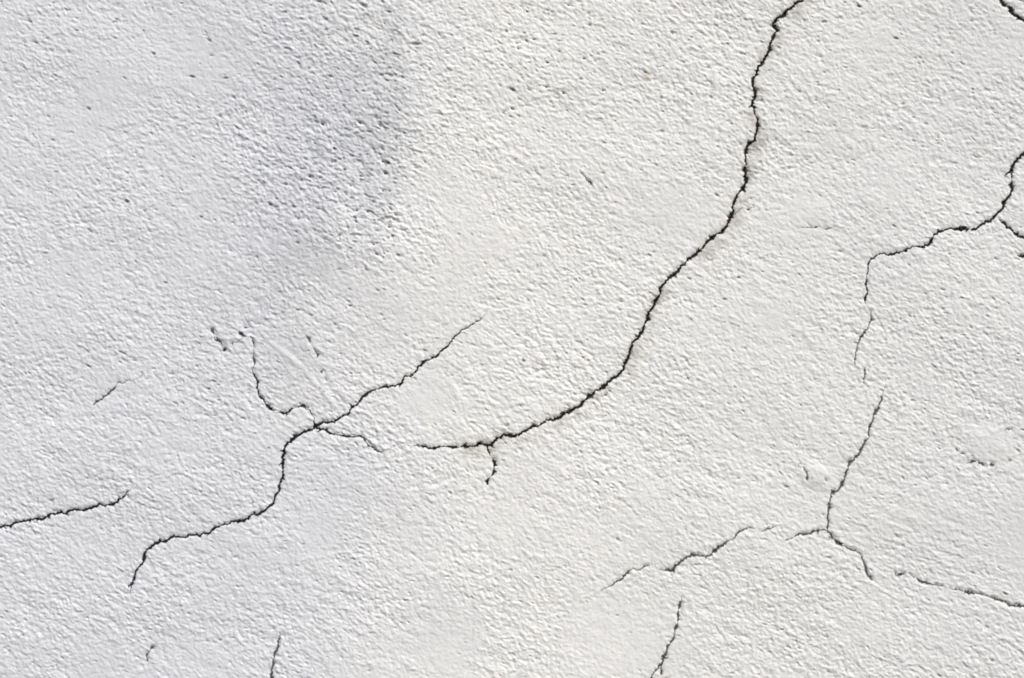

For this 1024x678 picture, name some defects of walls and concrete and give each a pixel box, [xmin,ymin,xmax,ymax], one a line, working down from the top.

crack [999,0,1024,22]
crack [417,0,804,485]
crack [0,491,128,528]
crack [128,319,481,588]
crack [651,602,681,678]
crack [612,152,1024,608]